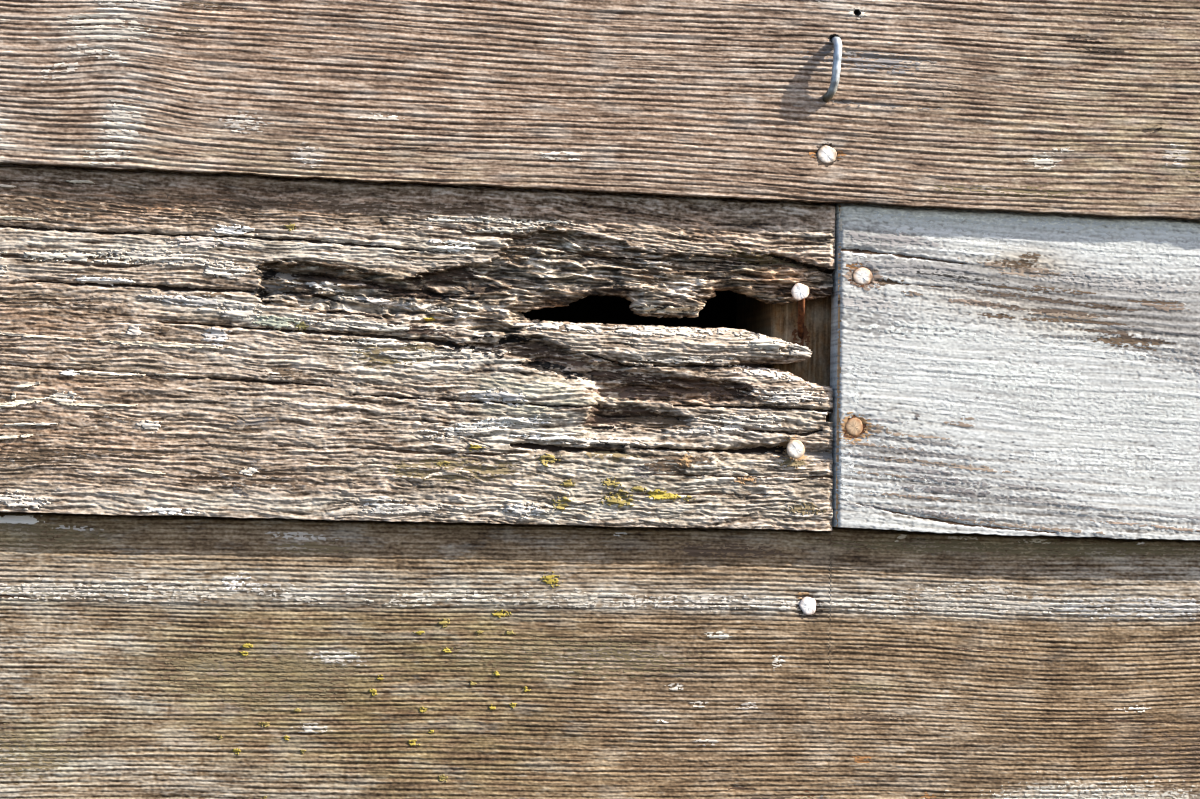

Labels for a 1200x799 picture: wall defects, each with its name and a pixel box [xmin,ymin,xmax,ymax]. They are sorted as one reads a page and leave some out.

crack [0,225,967,345]